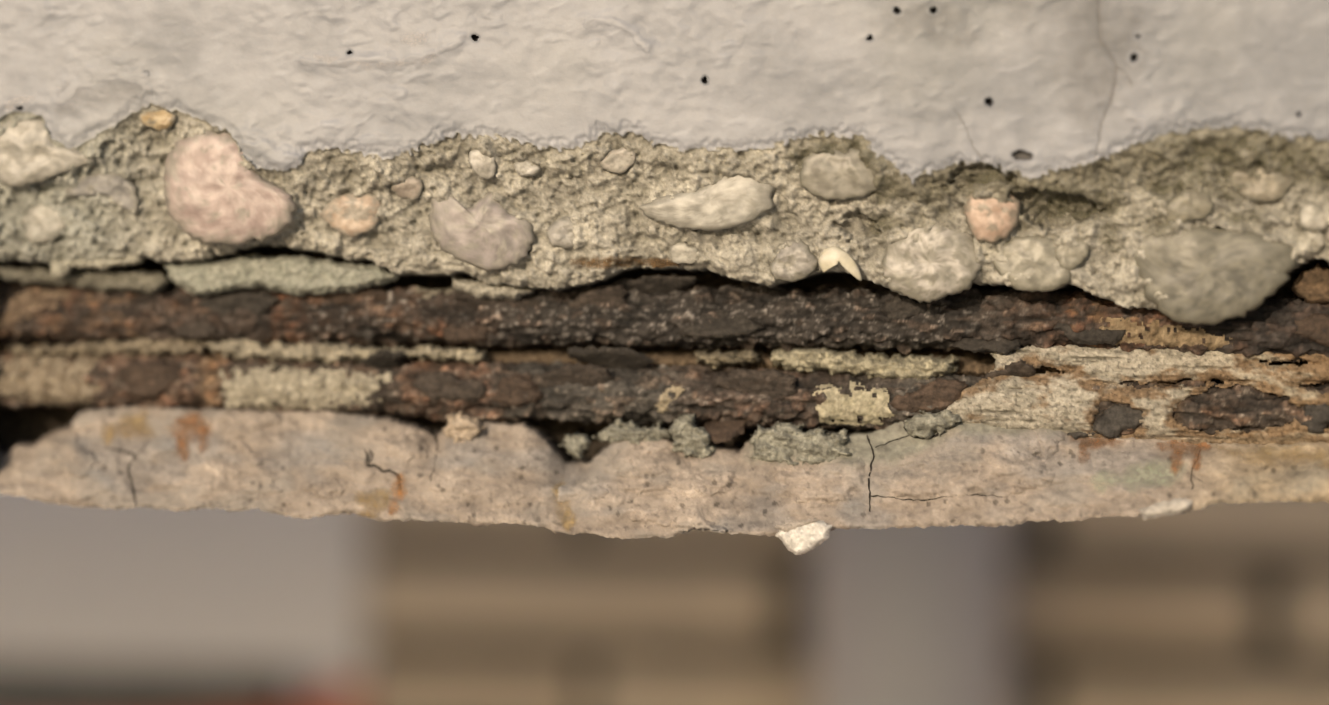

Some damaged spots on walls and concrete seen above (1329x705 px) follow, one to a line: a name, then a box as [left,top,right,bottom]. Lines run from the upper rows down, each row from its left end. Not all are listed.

spalling [0,104,1329,325]
crack [106,441,148,508]
rust [174,412,208,460]
crack [364,417,438,488]
spalling [0,337,1329,555]